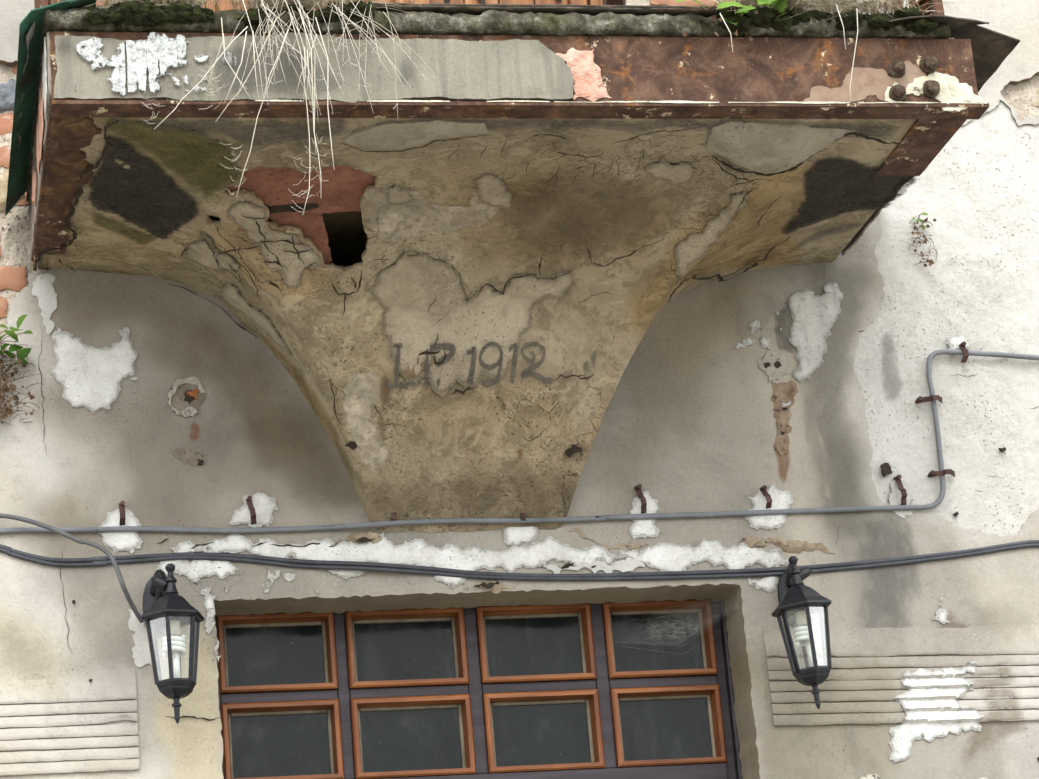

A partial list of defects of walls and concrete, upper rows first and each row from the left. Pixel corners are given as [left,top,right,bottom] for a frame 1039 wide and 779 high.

spalling [555,48,613,102]
peeling [0,64,138,414]
crack [37,120,259,339]
damp [88,121,241,244]
crack [179,214,317,297]
crack [412,298,446,365]
crack [332,210,664,315]
damp [783,159,925,234]
peeling [853,75,1039,536]
rust [777,452,788,477]
peeling [156,528,835,662]
peeling [888,661,984,763]